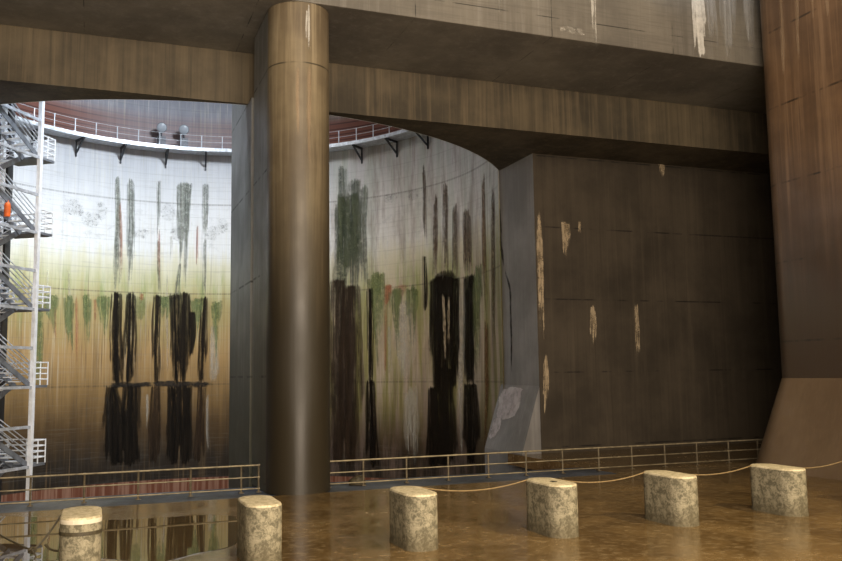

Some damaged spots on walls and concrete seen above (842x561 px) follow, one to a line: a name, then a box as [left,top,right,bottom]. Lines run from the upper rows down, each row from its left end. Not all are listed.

efflorescence [692,0,706,57]
water stain [103,292,208,465]
water stain [365,289,379,467]
water stain [422,256,523,467]